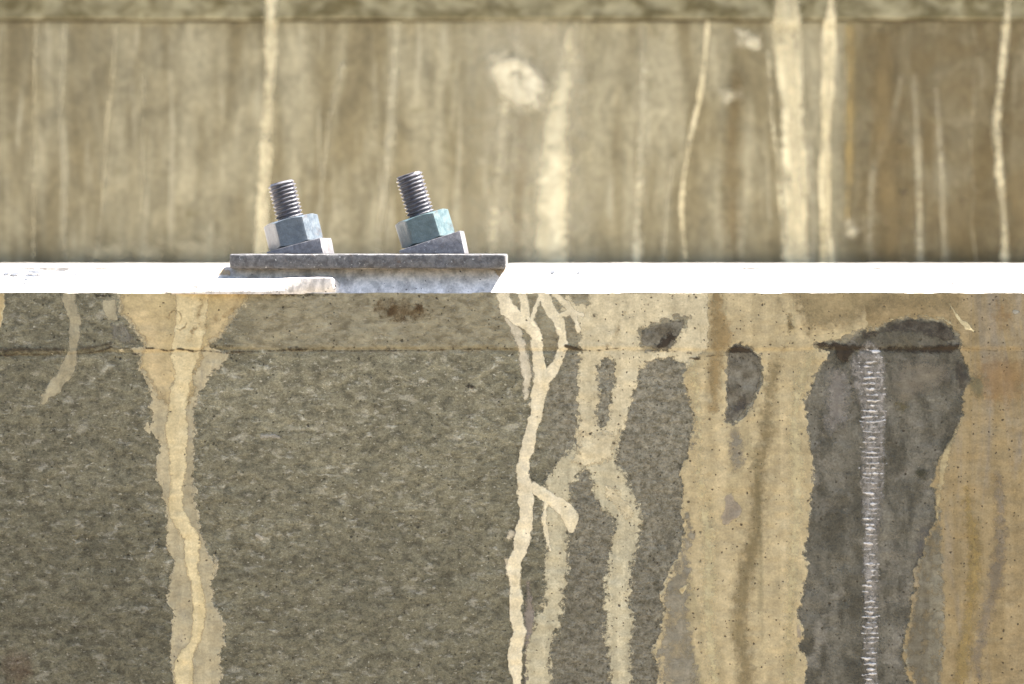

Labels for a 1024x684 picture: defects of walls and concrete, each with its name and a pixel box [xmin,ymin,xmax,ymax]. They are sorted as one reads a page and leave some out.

leakage [40,293,82,405]
leakage [102,293,248,684]
leakage [496,293,1024,684]